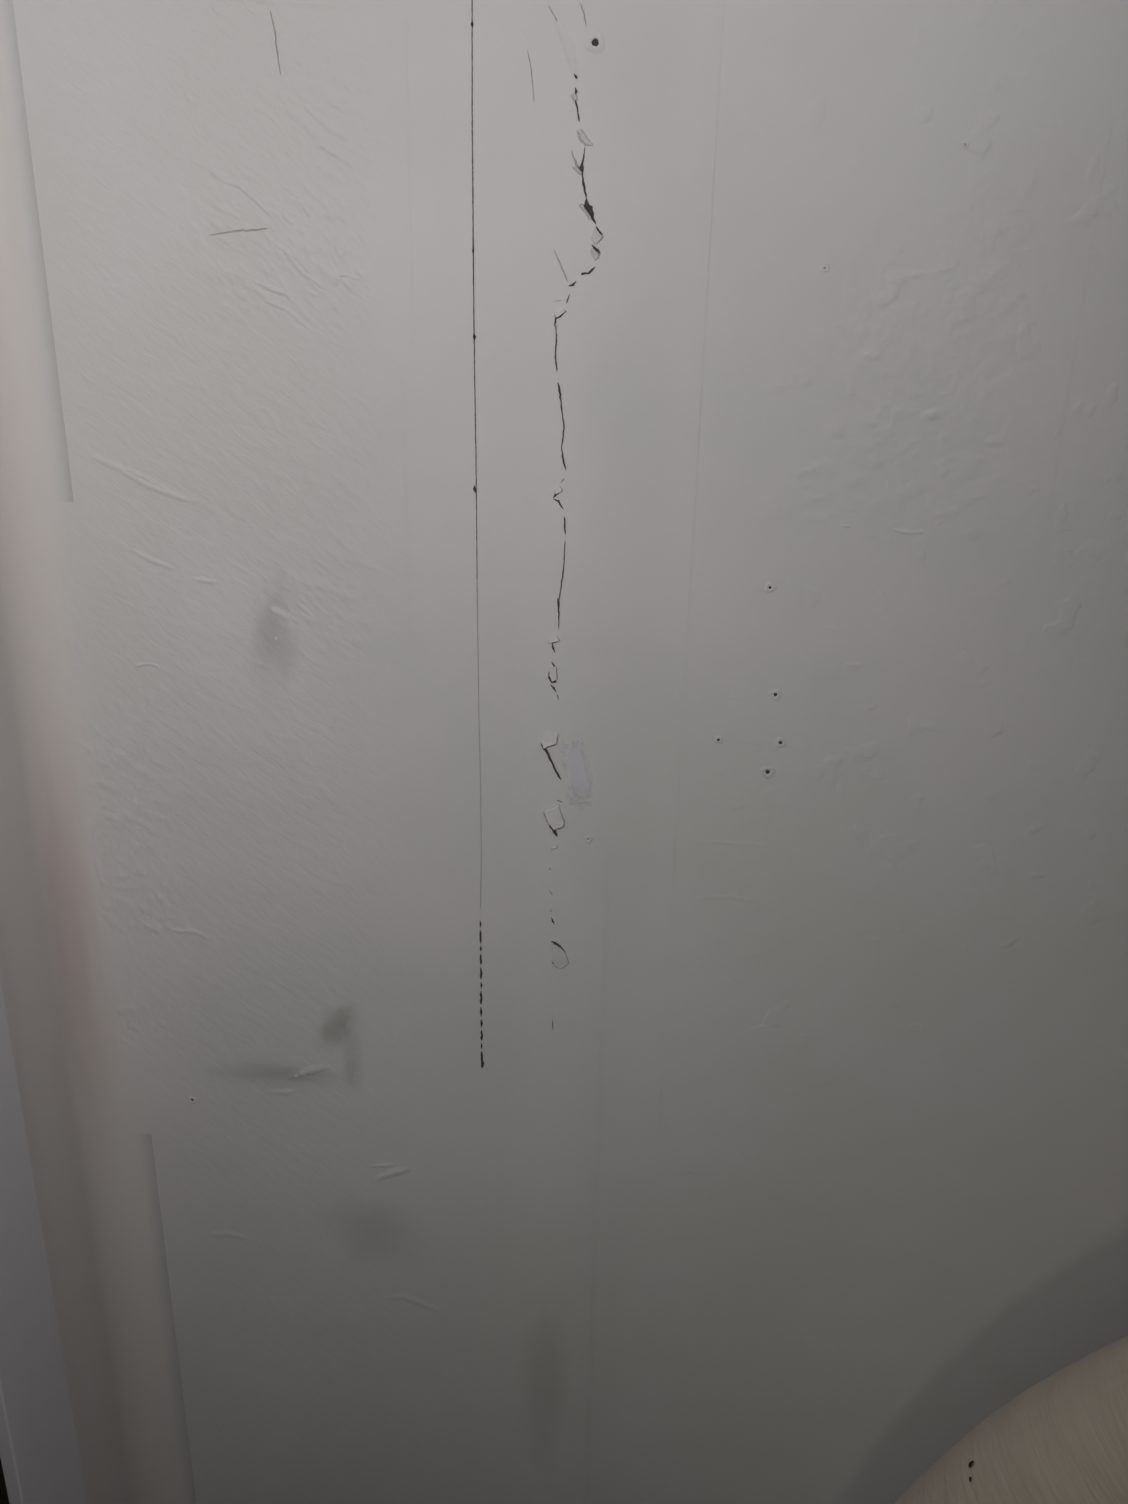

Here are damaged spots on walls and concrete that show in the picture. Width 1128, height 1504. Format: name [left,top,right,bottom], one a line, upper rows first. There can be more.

crack [520,3,603,969]